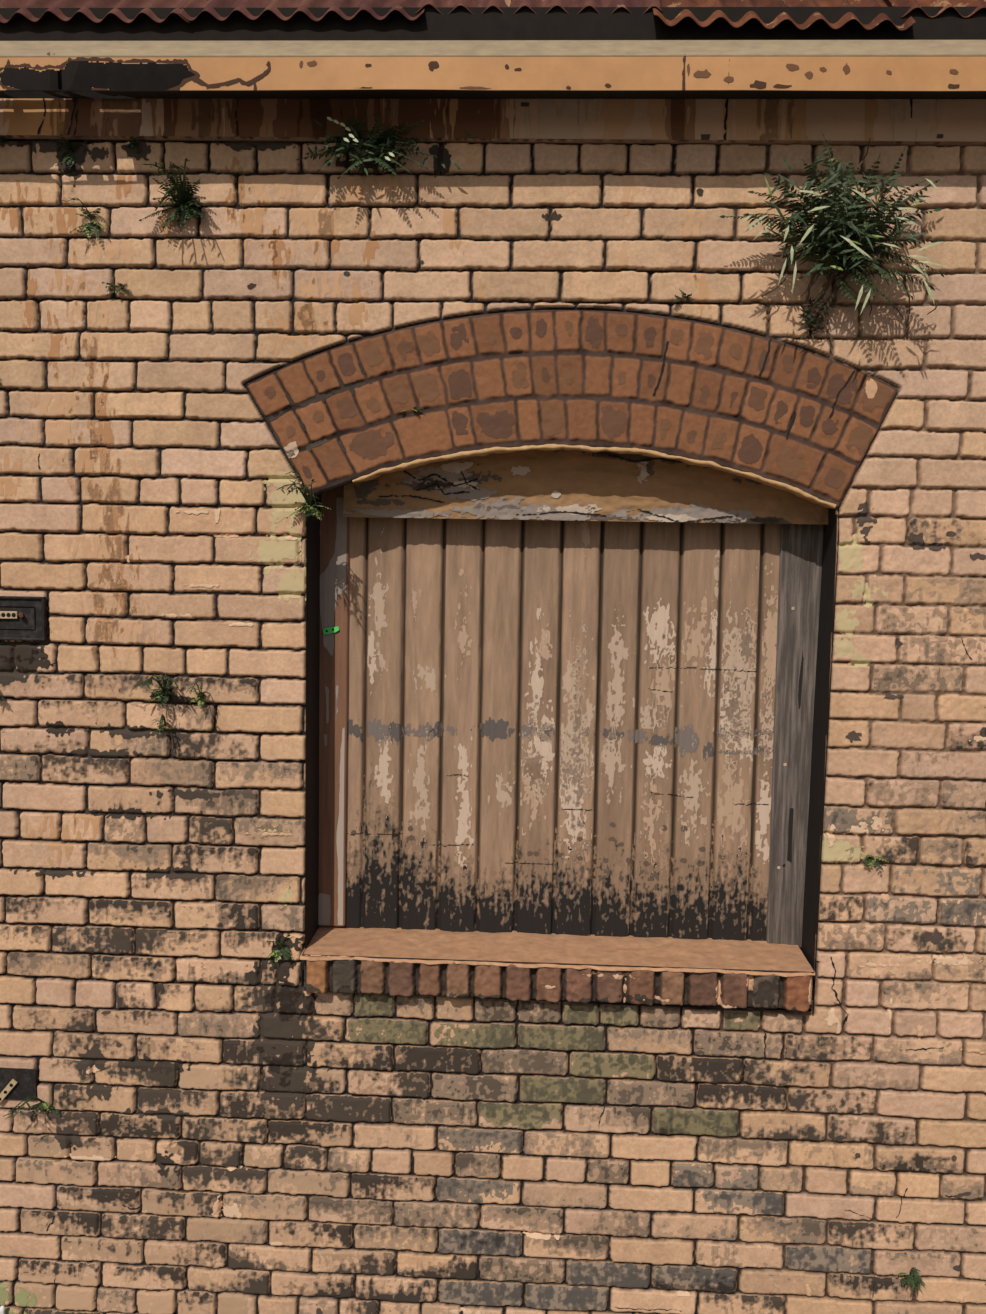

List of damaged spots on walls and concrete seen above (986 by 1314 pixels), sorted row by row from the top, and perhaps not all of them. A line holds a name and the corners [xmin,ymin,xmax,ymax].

peeling [367,551,389,695]
peeling [411,568,473,696]
peeling [320,461,756,656]
peeling [488,550,778,881]
peeling [374,727,433,863]
peeling [454,736,474,875]
leakage [343,762,769,941]
leakage [5,885,480,1304]
leakage [657,1035,954,1173]
leakage [300,1230,517,1314]
leakage [655,1271,784,1310]
mould [829,1274,908,1292]